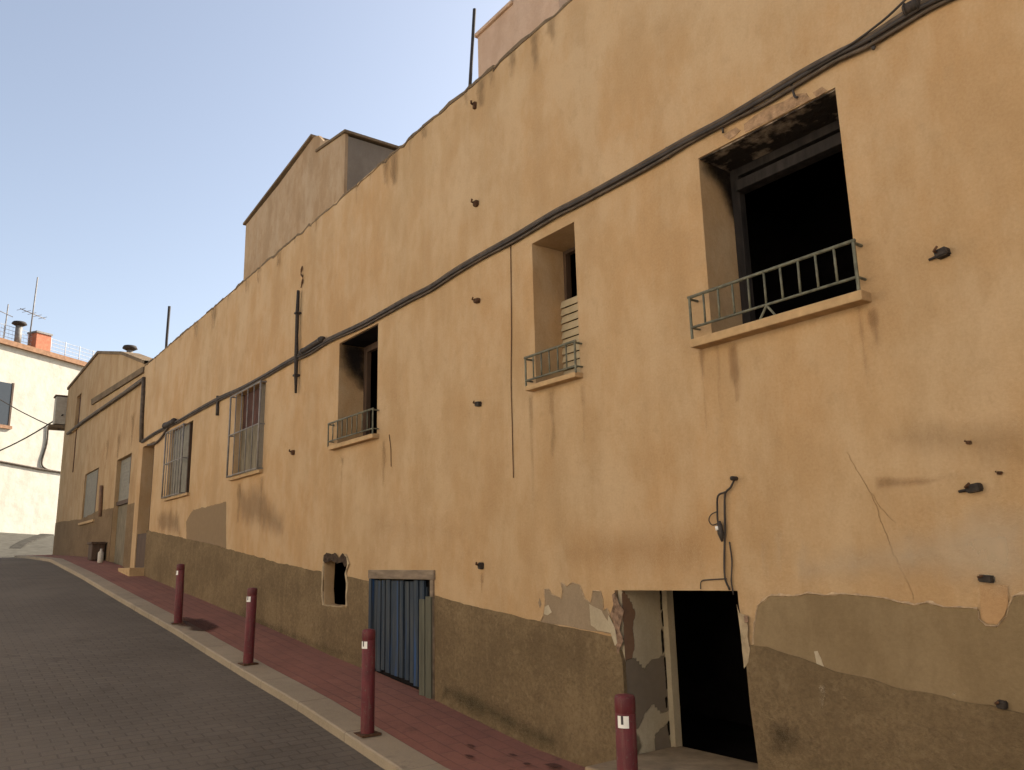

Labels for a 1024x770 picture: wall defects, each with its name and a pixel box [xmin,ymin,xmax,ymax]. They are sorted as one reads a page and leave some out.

peeling [538,582,671,754]
peeling [736,583,1024,713]